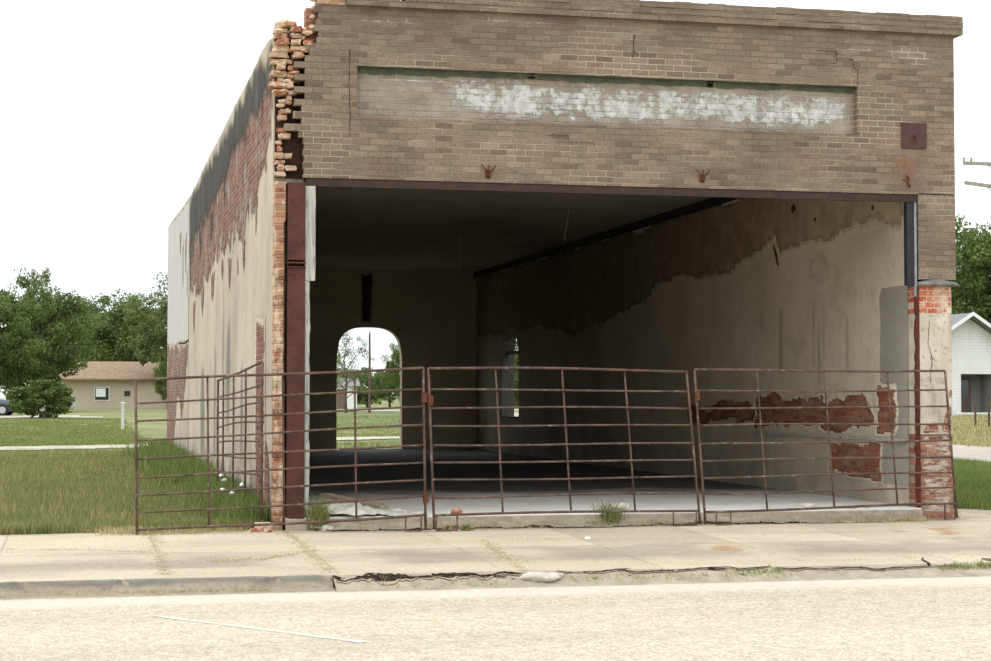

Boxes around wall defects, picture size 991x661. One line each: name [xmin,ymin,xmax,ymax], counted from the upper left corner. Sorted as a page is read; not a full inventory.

peeling [180,0,346,325]
flaking render [476,198,905,347]
spalling [167,343,187,444]
spalling [688,380,899,488]
peeling [922,390,952,512]
crack [330,571,522,585]
crack [557,557,991,573]